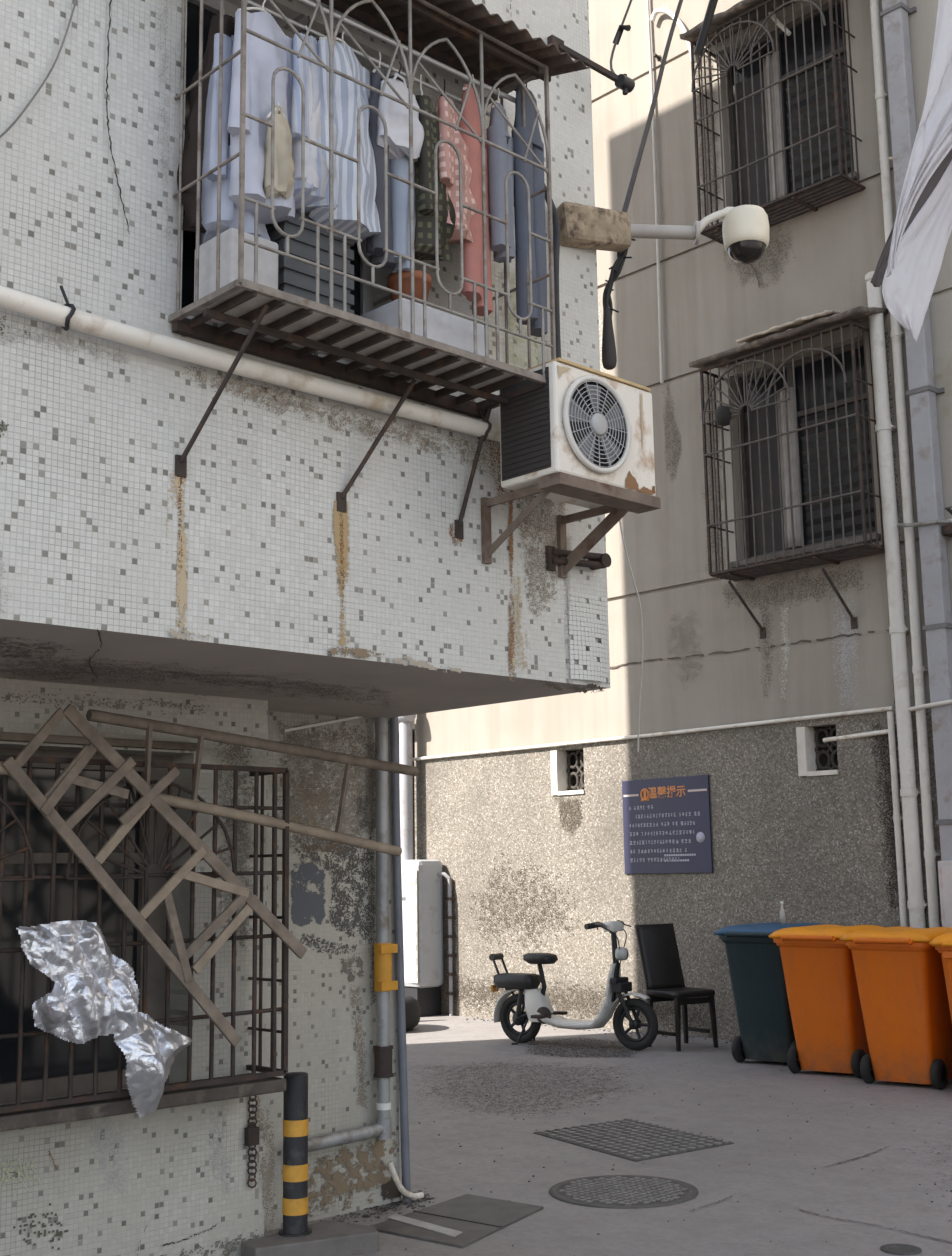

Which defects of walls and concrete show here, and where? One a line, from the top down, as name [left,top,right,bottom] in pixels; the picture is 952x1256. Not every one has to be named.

crack [106,0,130,234]
crack [89,629,102,677]
corrosion [165,470,189,630]
corrosion [333,500,349,646]
leakage [182,366,574,684]
corrosion [507,490,529,681]
leakage [699,374,868,708]
peeling [295,832,376,956]
spalling [381,1178,401,1200]